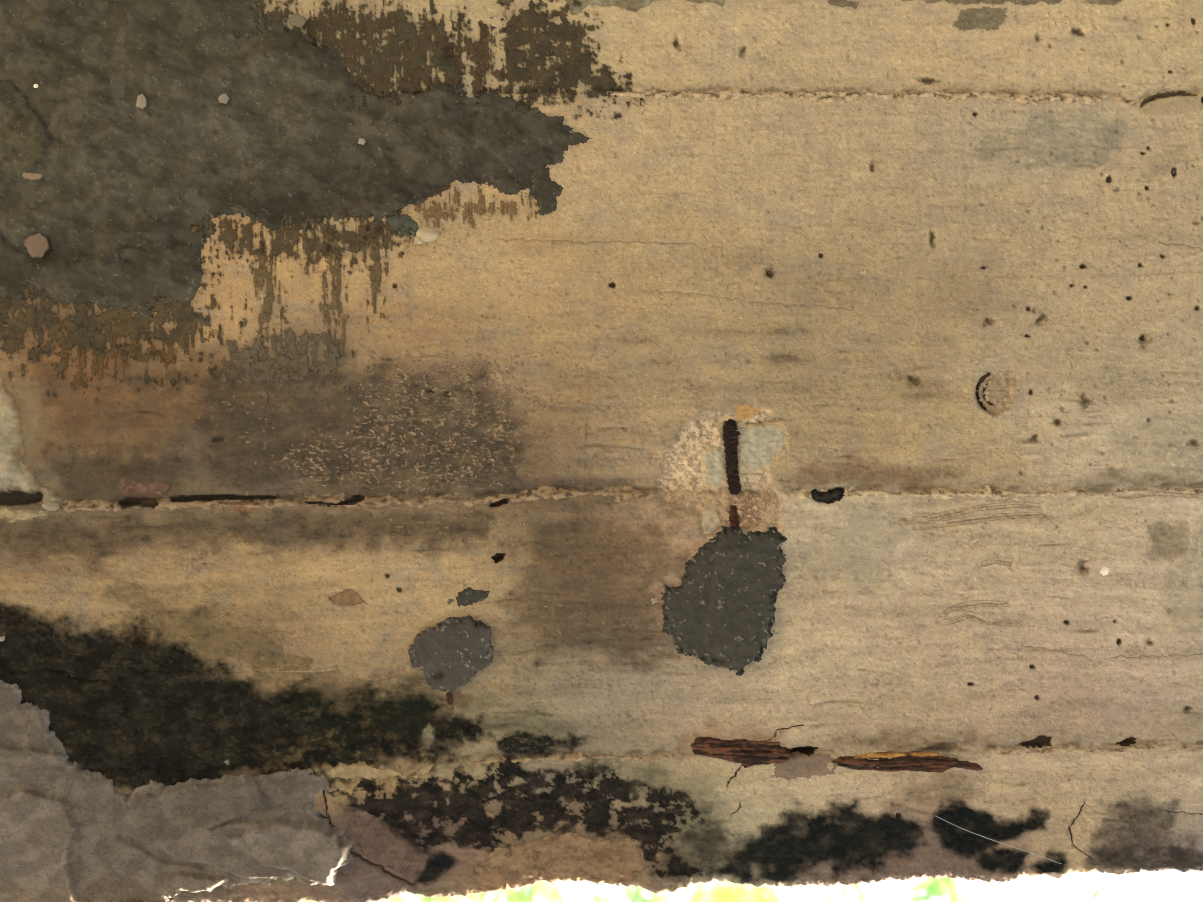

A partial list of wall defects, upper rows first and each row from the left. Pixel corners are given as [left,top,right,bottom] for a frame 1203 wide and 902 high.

spalling [651,401,792,538]
peeling [253,652,312,691]
peeling [327,761,434,780]
peeling [423,724,434,747]
damp [0,603,1067,885]
peeling [343,808,429,883]
damp [1089,802,1202,873]